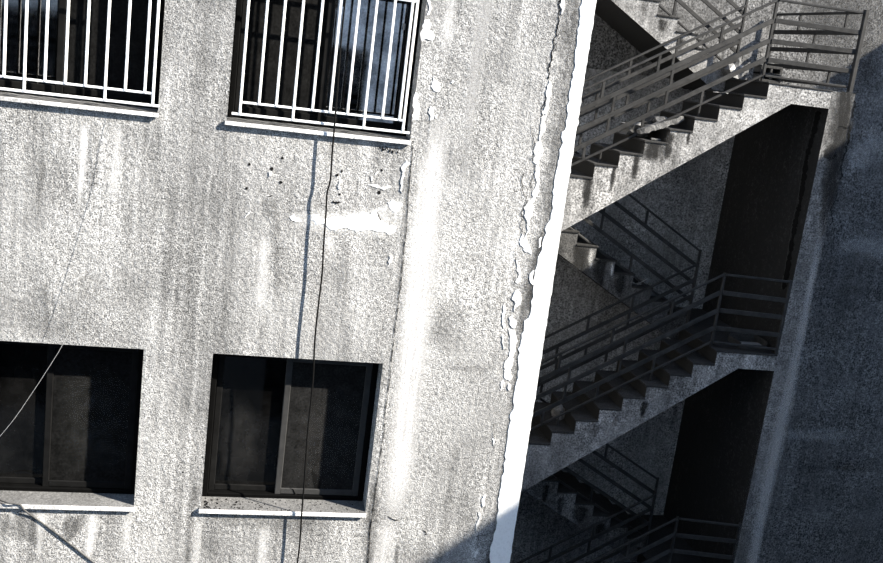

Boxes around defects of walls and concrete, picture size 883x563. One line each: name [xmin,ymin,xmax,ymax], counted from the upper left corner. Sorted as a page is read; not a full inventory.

water stain [78,128,87,192]
flaking render [519,80,552,254]
crack [520,0,561,230]
crack [367,140,414,563]
flaking render [500,260,534,391]
water stain [37,515,45,549]
water stain [66,516,96,555]